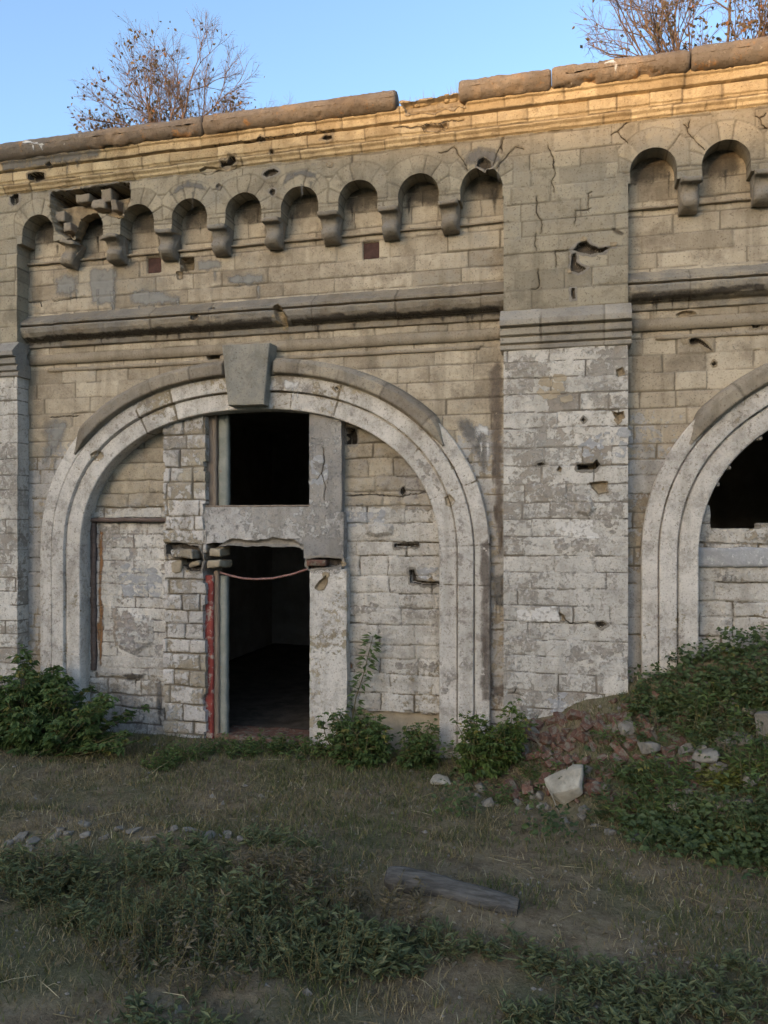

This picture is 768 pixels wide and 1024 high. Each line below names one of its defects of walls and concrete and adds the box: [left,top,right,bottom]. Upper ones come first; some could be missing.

spalling [26,161,132,241]
crack [534,148,568,290]
spalling [567,228,624,276]
leakage [459,363,504,701]
peeling [530,411,631,558]